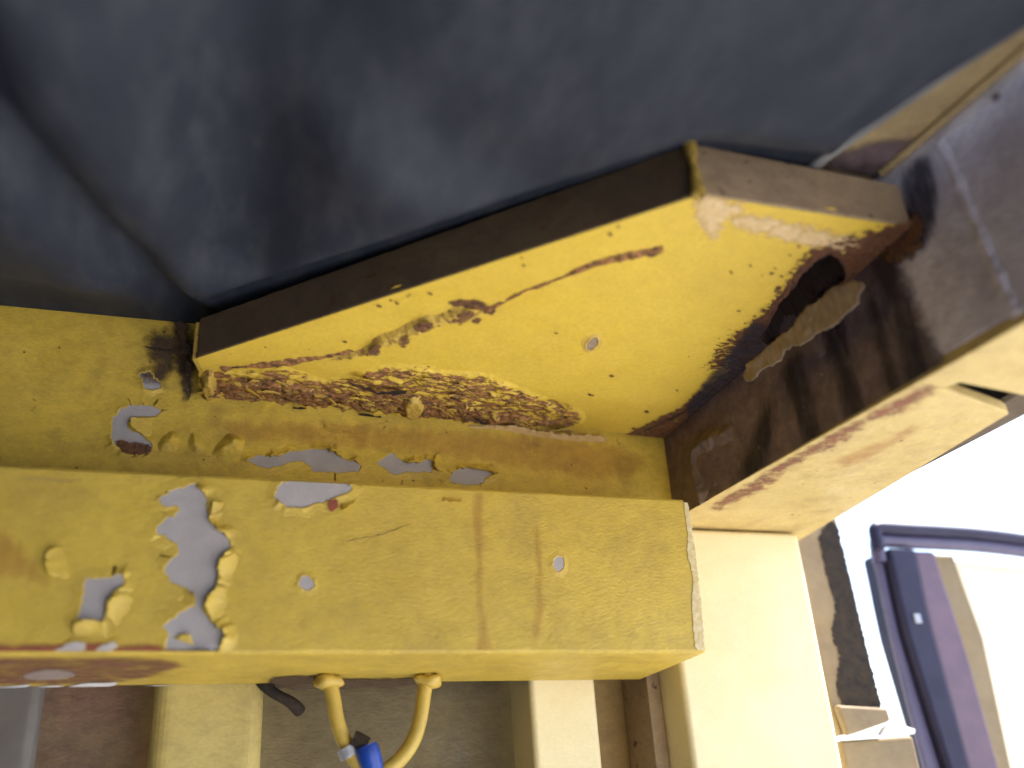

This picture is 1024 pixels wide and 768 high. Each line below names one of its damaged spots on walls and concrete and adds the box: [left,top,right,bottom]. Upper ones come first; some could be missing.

peeling [683,141,861,339]
peeling [96,366,175,467]
rust [142,321,587,432]
rust [449,299,496,323]
rust [626,210,943,511]
peeling [240,441,502,518]
peeling [47,564,138,652]
peeling [142,476,243,651]
rust [0,643,179,684]